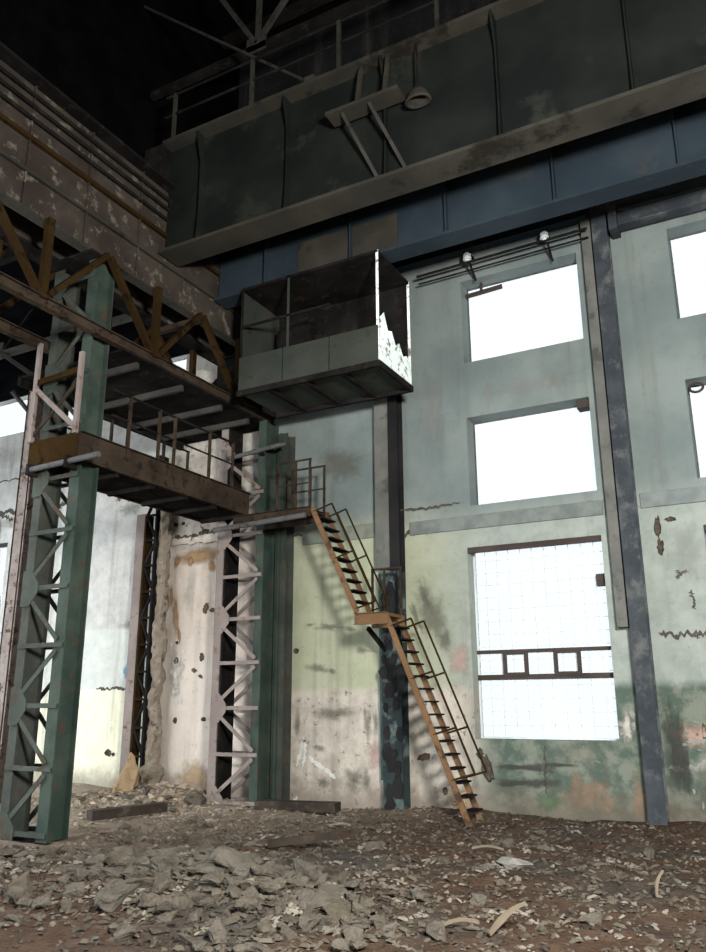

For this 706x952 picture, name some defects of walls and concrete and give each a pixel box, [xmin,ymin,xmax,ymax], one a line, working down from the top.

crack [0,508,15,522]
crack [400,502,461,538]
spalling [654,516,676,556]
rust [175,549,215,571]
crack [658,569,706,640]